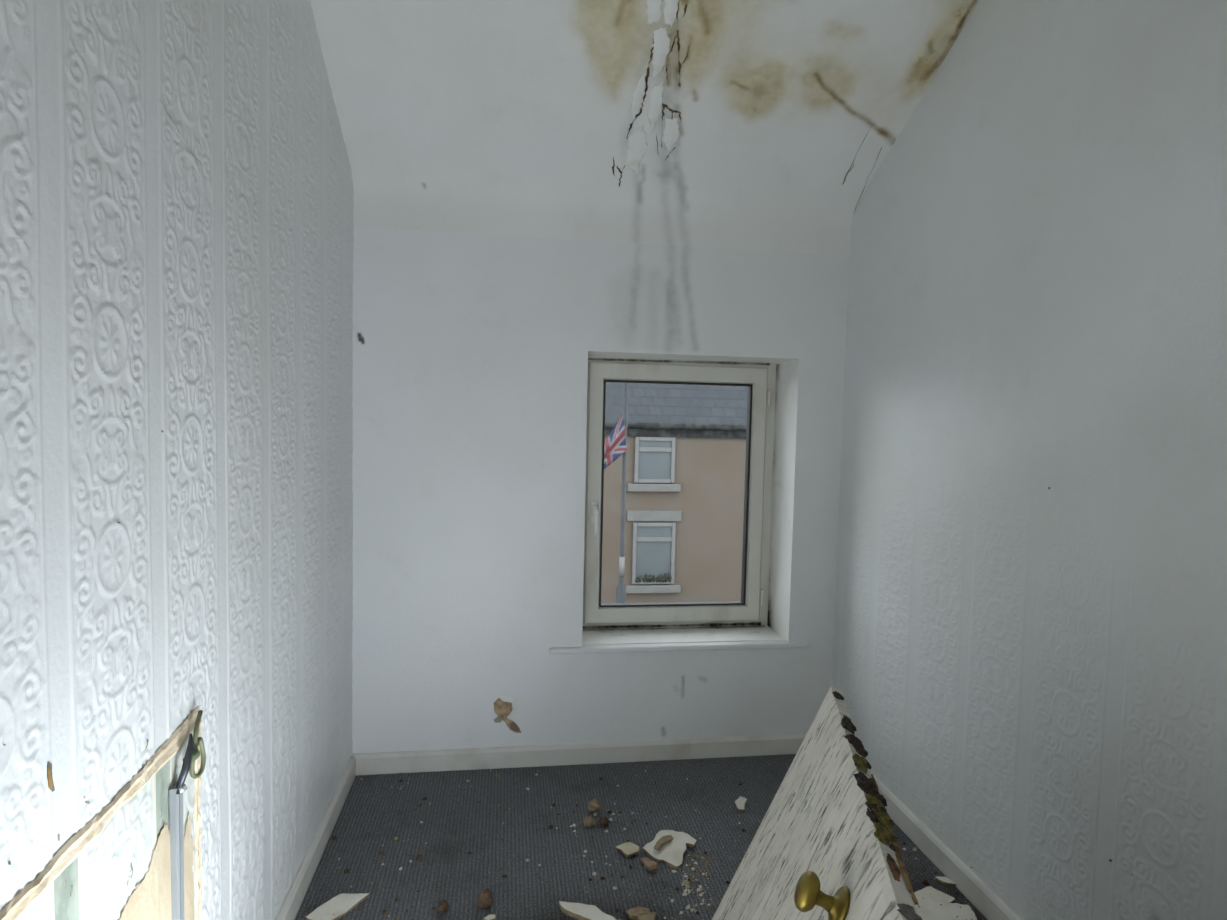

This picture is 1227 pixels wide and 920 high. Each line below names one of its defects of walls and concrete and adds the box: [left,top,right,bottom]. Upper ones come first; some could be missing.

crack [612,0,690,186]
spalling [494,696,521,733]